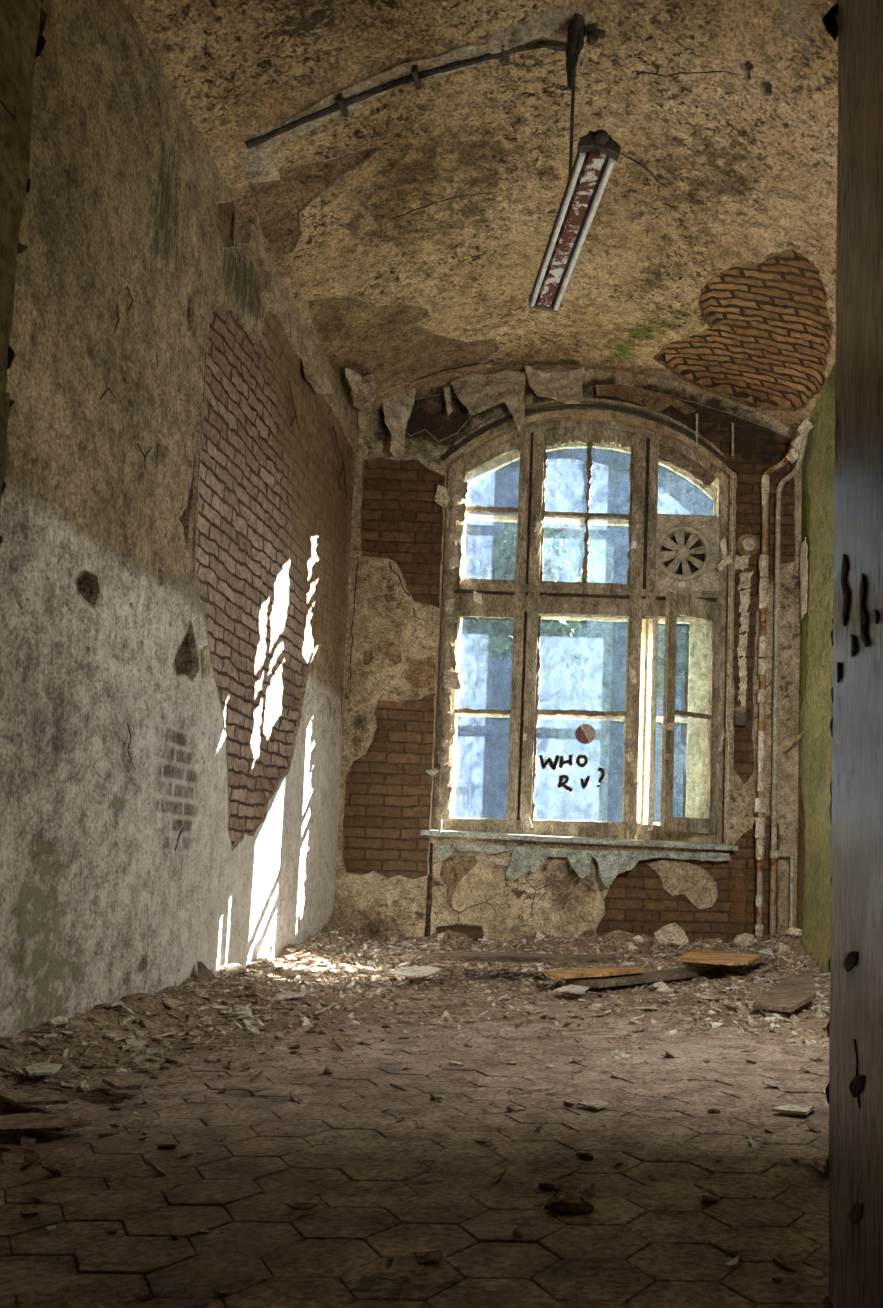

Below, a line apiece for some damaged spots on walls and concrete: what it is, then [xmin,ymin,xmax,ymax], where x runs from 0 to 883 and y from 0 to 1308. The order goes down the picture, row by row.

peeling [822,3,838,41]
peeling [369,127,509,247]
spalling [76,569,100,610]
spalling [174,139,835,944]